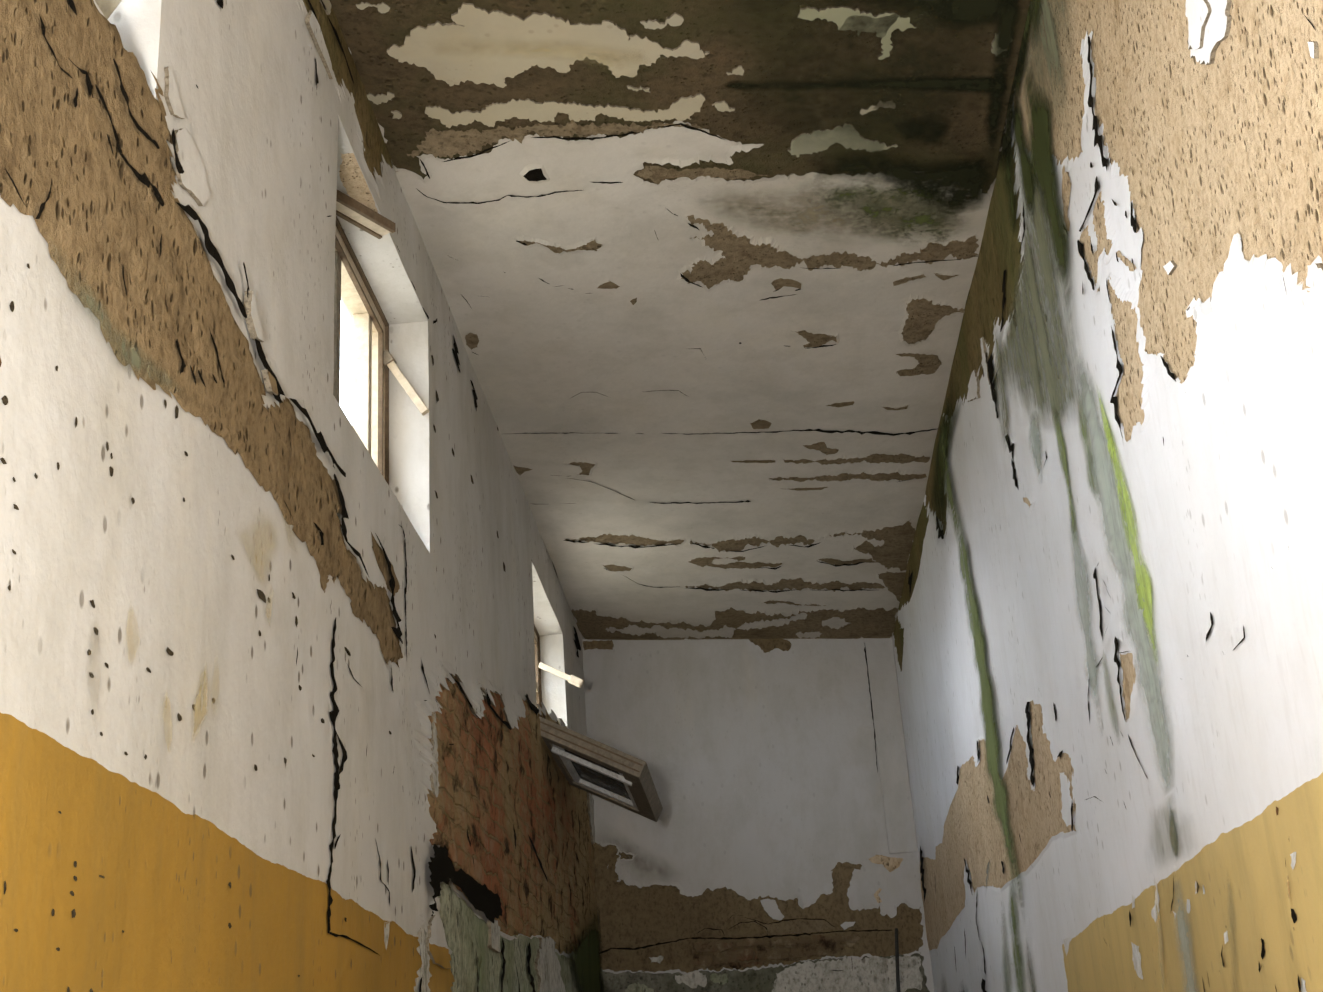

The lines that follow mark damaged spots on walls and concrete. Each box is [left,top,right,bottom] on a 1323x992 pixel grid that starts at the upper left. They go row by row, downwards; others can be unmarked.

spalling [0,0,403,667]
spalling [293,0,1323,676]
water stain [726,0,1155,650]
crack [326,525,437,955]
spalling [411,659,1080,992]
water stain [1004,889,1035,992]
water stain [1071,525,1096,695]